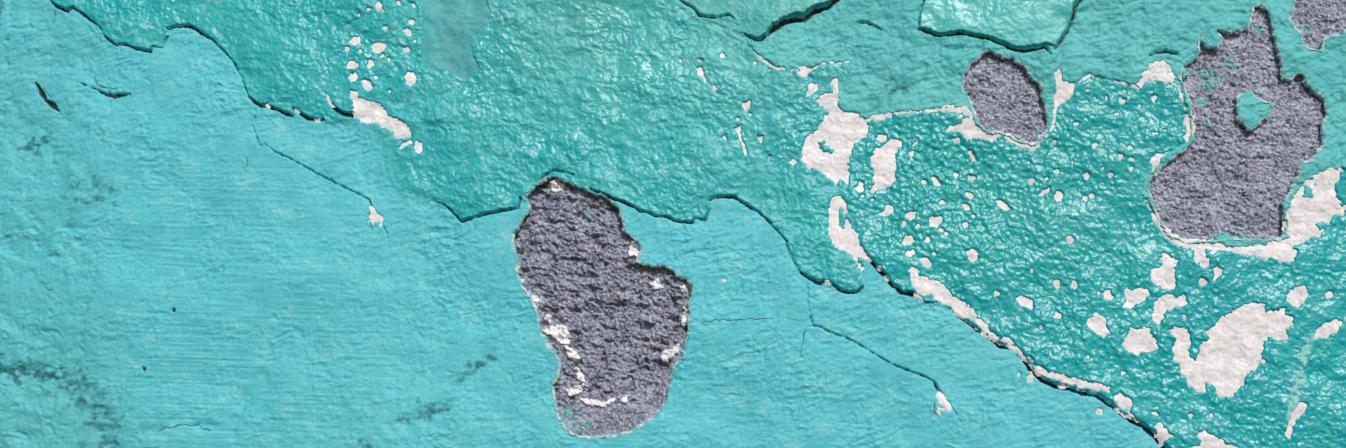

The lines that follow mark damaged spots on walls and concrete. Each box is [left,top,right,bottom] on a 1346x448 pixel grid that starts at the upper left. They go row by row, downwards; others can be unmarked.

crack [750,0,871,42]
crack [919,0,1082,53]
crack [37,84,60,112]
crack [51,1,373,228]
peeling [345,0,491,154]
peeling [723,100,771,161]
spalling [753,0,1346,448]
spalling [511,175,694,439]
crack [894,365,939,417]